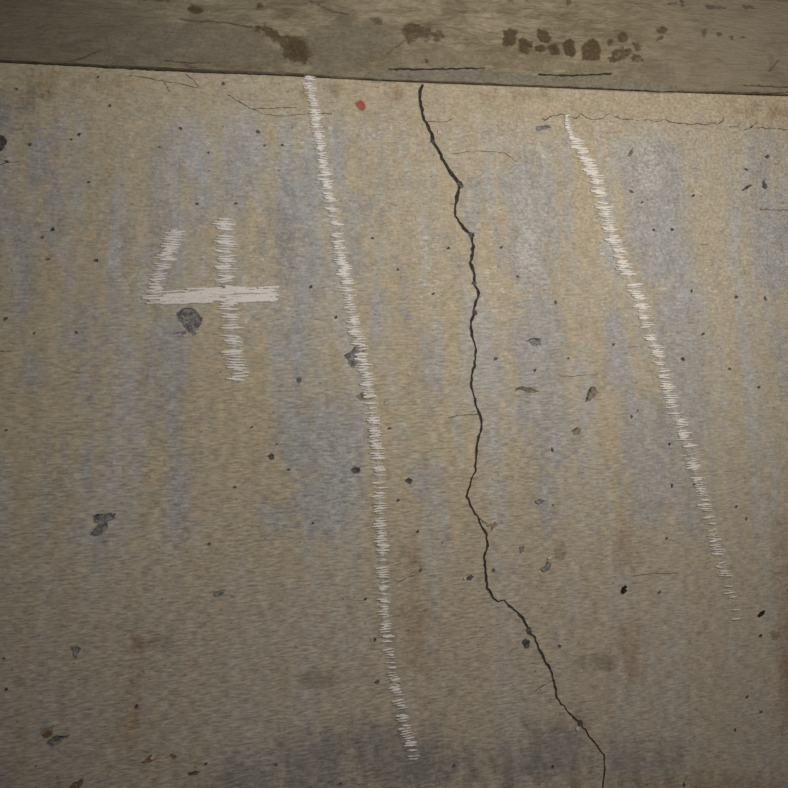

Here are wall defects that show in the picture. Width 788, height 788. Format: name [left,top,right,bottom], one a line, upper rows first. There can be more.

crack [389,40,606,788]
damp [498,130,574,538]
damp [624,135,692,284]
damp [626,288,708,530]